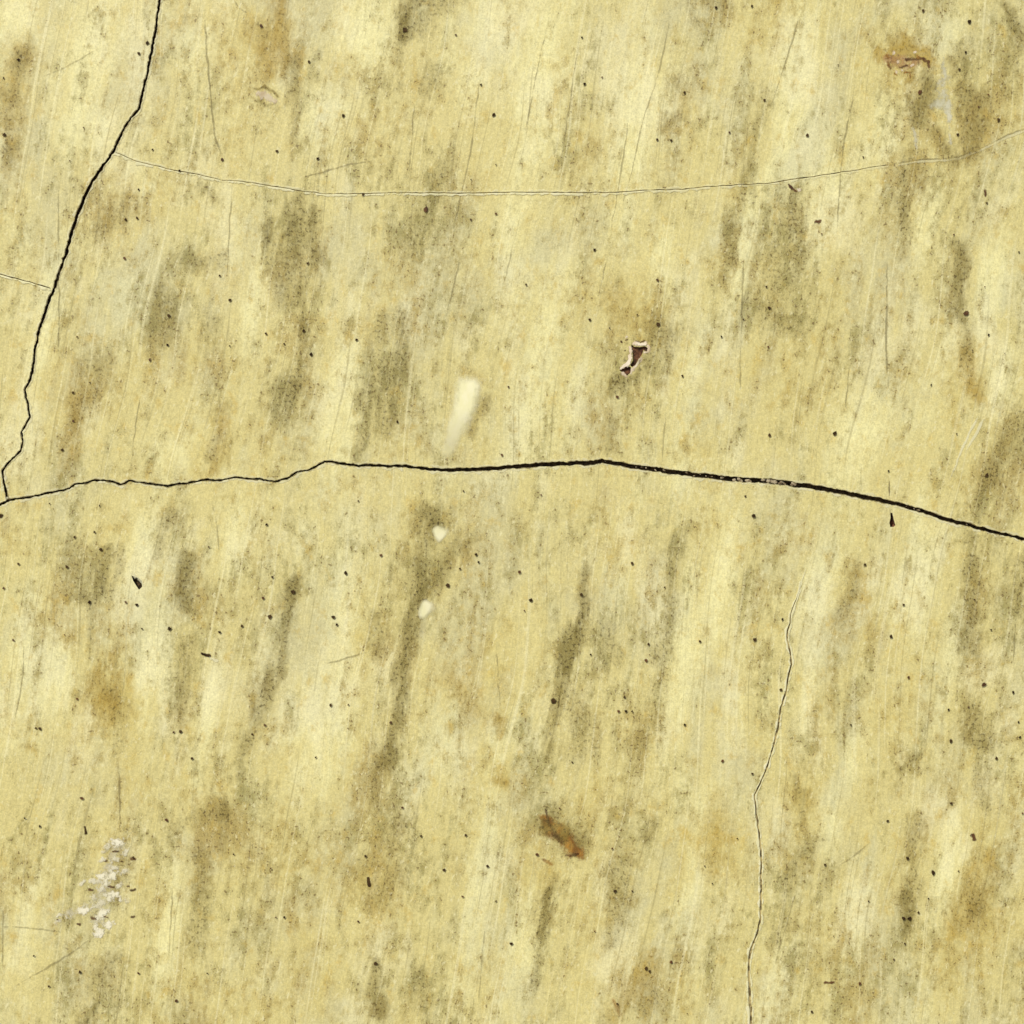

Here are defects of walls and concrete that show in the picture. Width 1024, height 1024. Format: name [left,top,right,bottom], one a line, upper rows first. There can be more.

crack [0,0,1024,543]
spalling [617,336,651,383]
rust [539,809,586,859]
crack [746,569,806,1024]